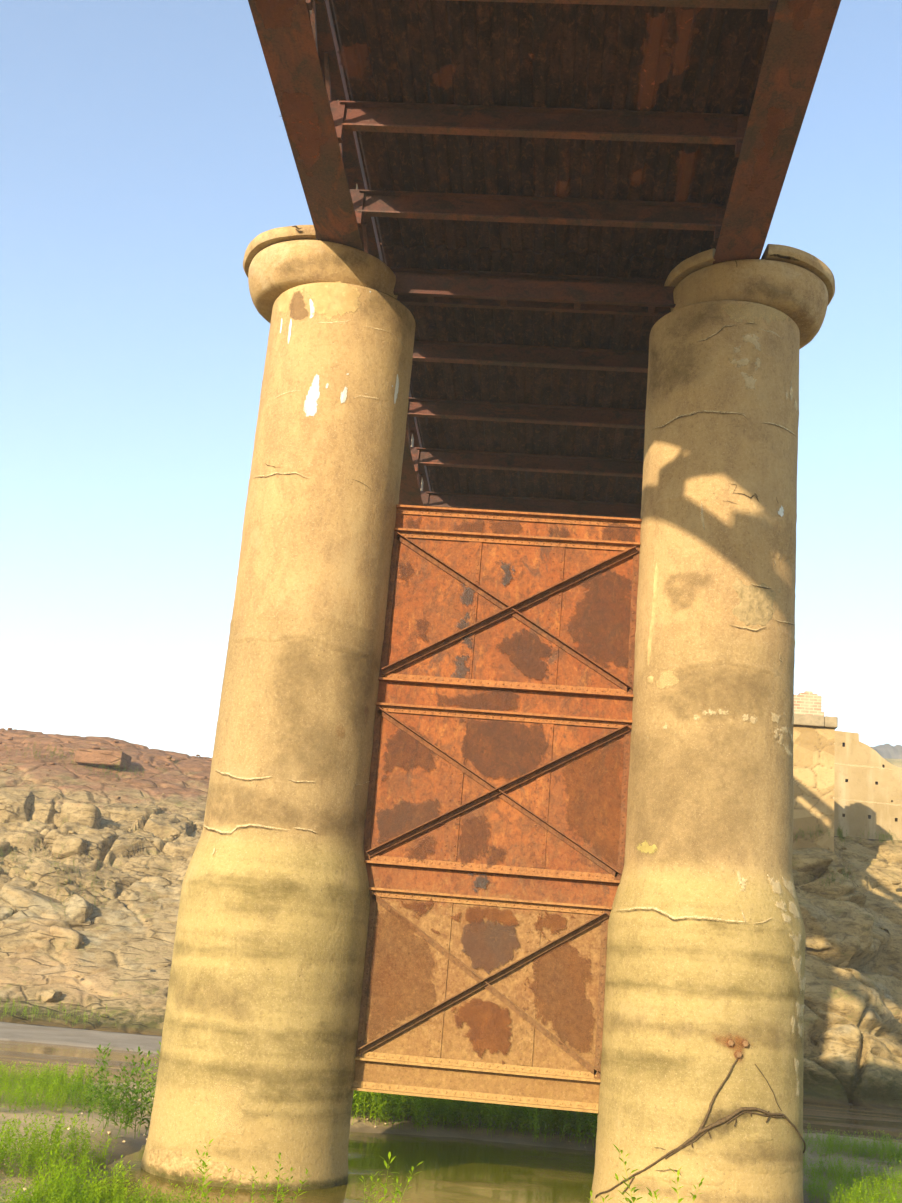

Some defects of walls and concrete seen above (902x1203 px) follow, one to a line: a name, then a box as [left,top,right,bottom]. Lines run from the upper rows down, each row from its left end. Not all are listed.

crack [221,772,313,783]
crack [203,824,315,835]
crack [620,907,769,924]